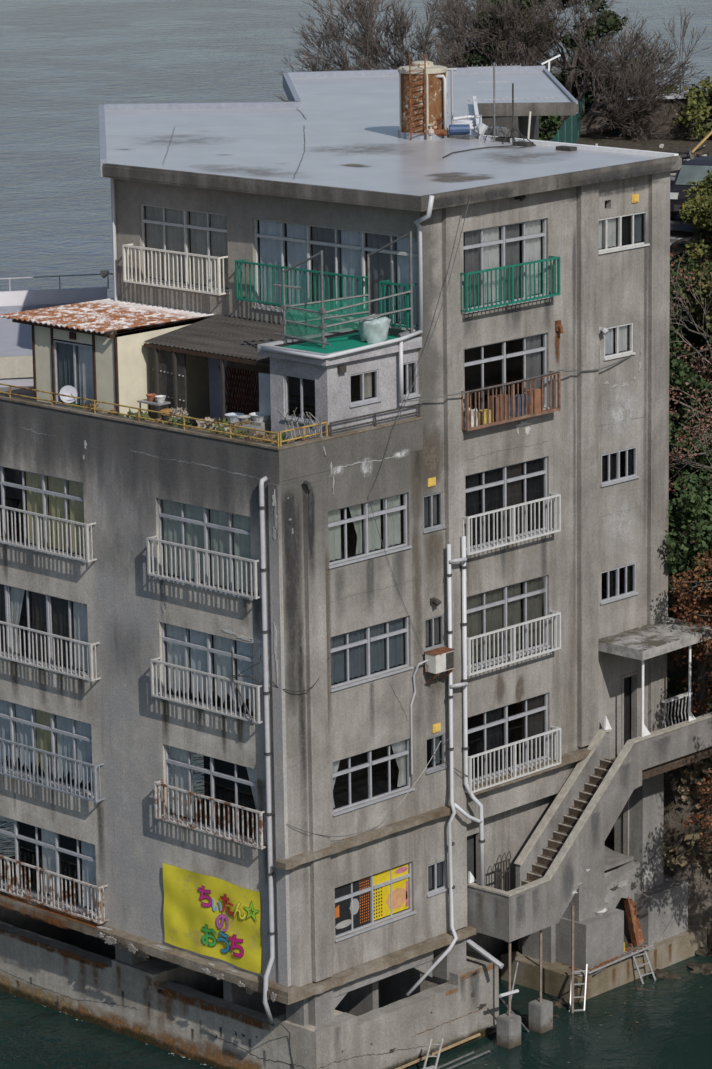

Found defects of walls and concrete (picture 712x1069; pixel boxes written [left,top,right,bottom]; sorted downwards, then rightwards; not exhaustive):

water stain [244,592,261,625]
corrosion [0,891,100,928]
corrosion [0,929,120,983]
corrosion [0,974,268,1069]
crack [207,1007,486,1069]